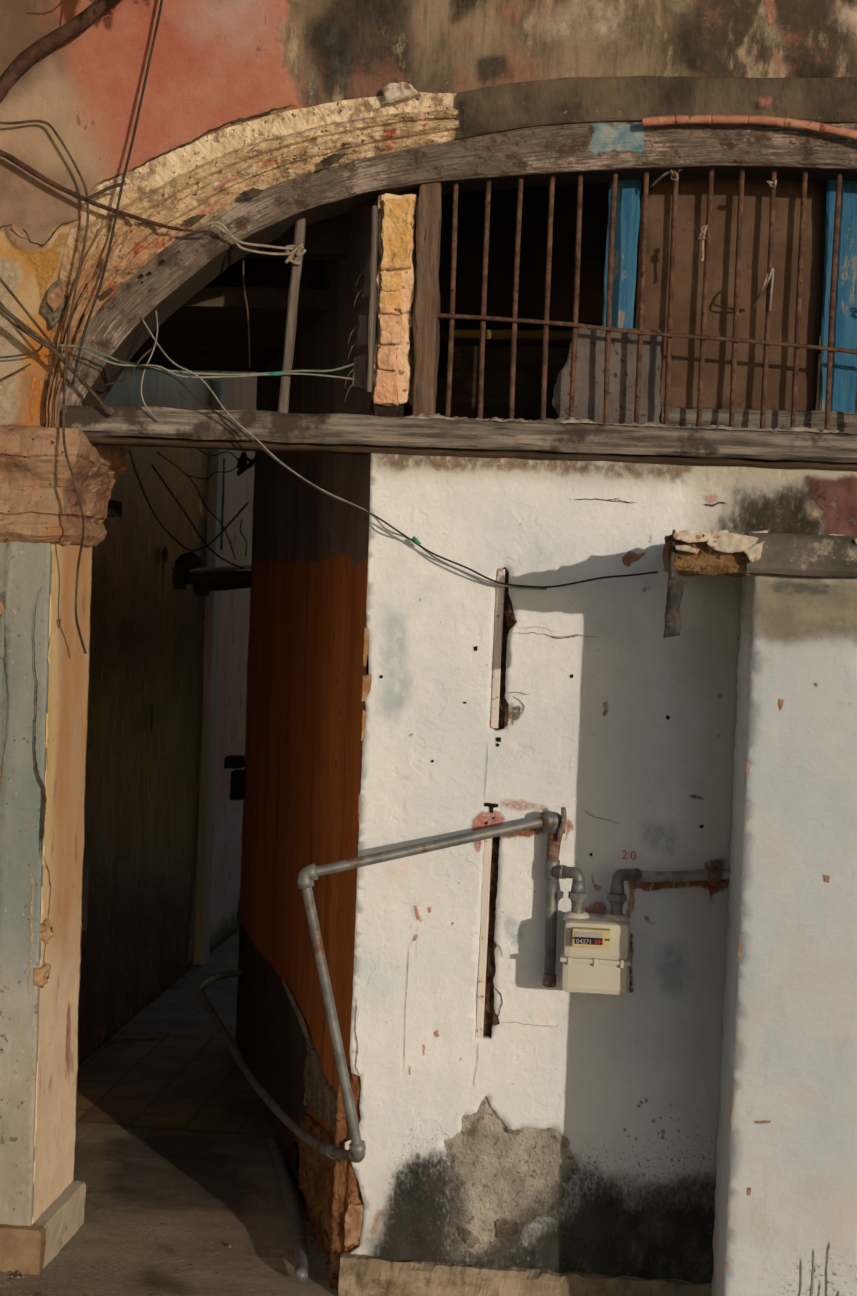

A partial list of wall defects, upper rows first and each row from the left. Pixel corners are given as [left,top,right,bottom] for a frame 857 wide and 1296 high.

water stain [318,0,408,81]
water stain [479,57,507,81]
water stain [546,0,618,43]
water stain [840,8,857,33]
flaking render [90,105,297,192]
peeling [672,530,768,562]
spalling [361,628,372,741]
corrosion [628,860,729,901]
spalling [282,979,364,1290]
spalling [444,1096,576,1259]
water stain [373,1129,717,1284]
mould [784,1241,857,1296]